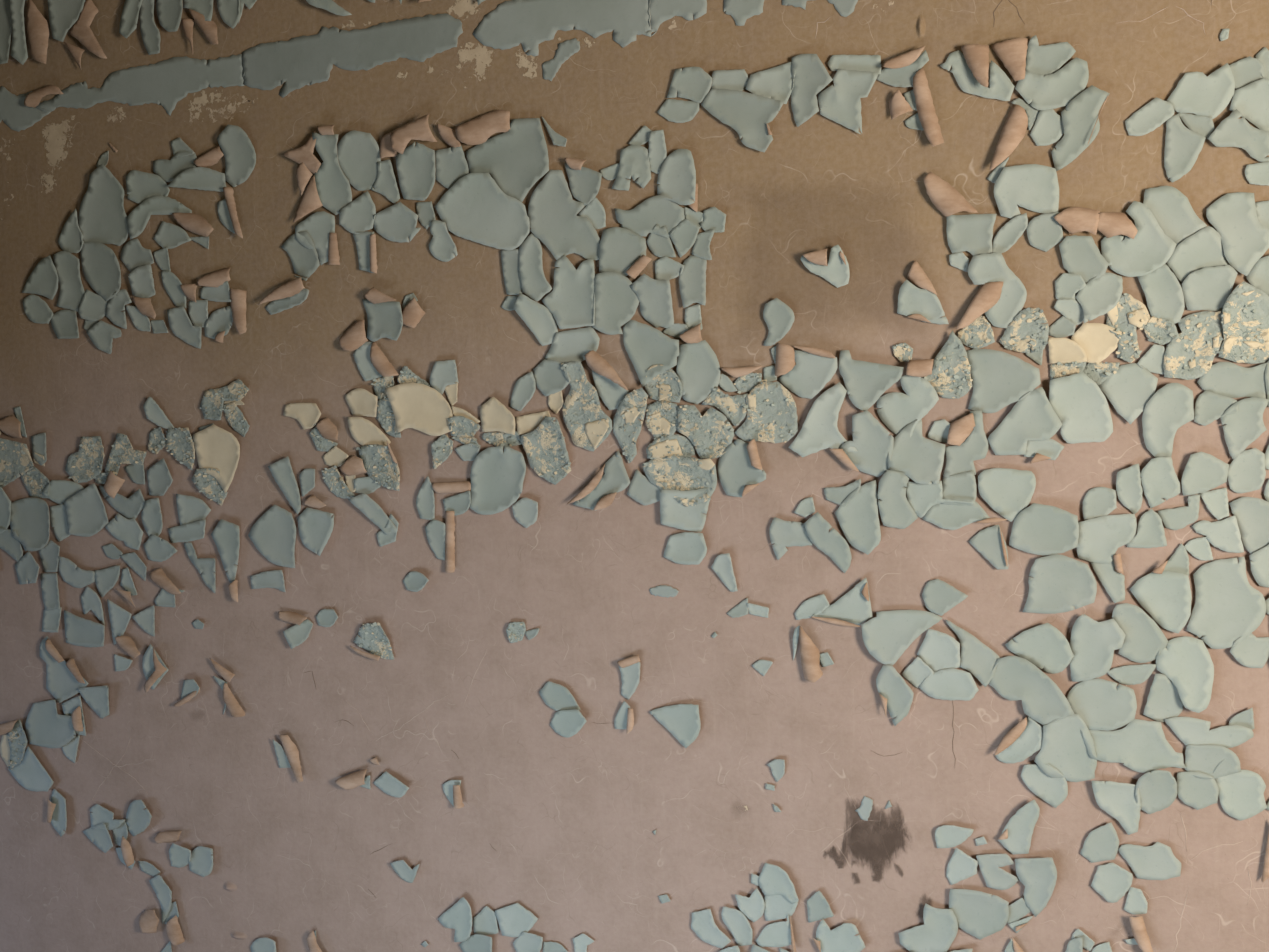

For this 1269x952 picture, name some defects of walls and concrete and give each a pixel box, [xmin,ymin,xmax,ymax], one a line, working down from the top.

peeling [0,0,707,132]
peeling [723,0,764,26]
peeling [828,0,858,17]
peeling [22,125,256,354]
peeling [248,35,1269,952]
peeling [0,379,250,837]
peeling [83,799,213,952]
damp [824,802,906,883]